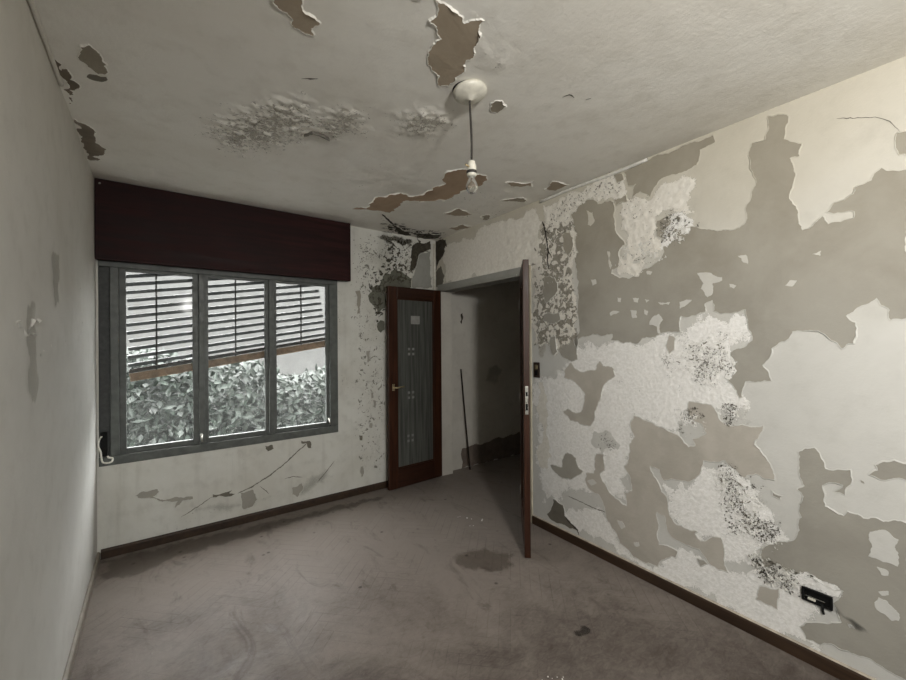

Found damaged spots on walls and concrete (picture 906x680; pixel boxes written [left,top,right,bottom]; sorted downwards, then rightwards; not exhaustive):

peeling [272,0,322,37]
peeling [426,0,485,87]
peeling [54,43,109,104]
peeling [73,118,107,161]
crack [837,117,900,132]
peeling [352,168,488,213]
peeling [500,181,534,204]
damp [660,209,699,243]
peeling [345,208,491,478]
peeling [531,113,906,680]
peeling [212,489,258,510]
damp [532,313,843,652]